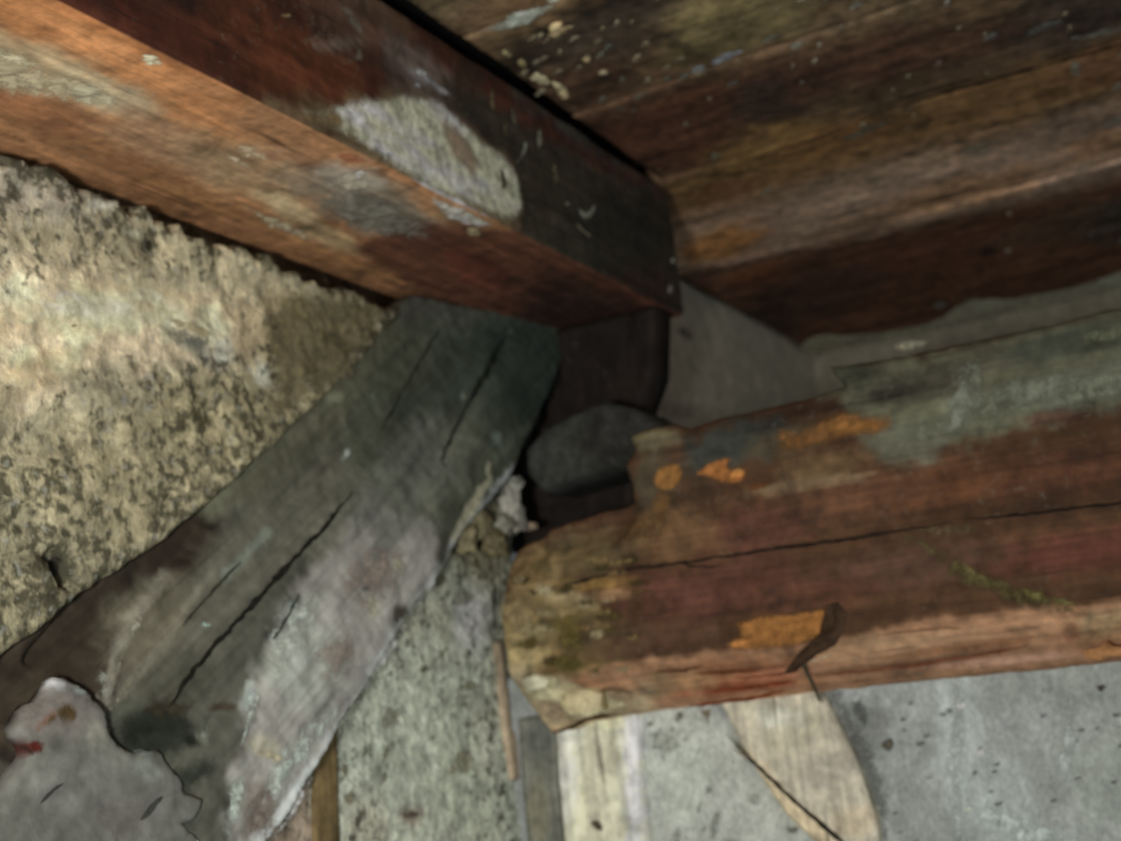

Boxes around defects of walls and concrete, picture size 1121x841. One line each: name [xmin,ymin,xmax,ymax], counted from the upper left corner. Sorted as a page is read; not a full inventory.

damp [0,50,115,104]
damp [143,55,161,65]
damp [229,146,266,167]
damp [323,154,425,237]
damp [434,198,491,236]
crack [442,336,506,460]
crack [533,502,1121,596]
crack [168,492,353,708]